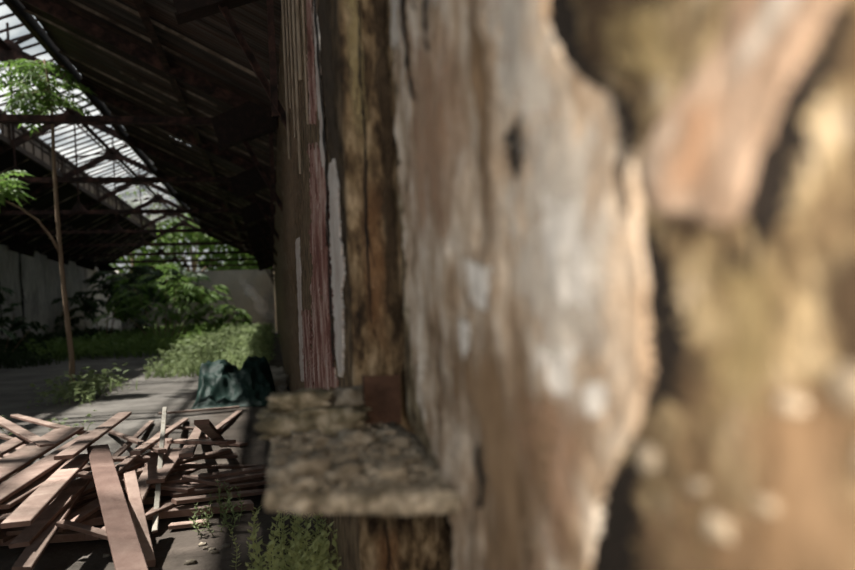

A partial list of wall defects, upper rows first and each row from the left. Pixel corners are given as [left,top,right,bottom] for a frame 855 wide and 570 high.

crack [400,0,429,100]